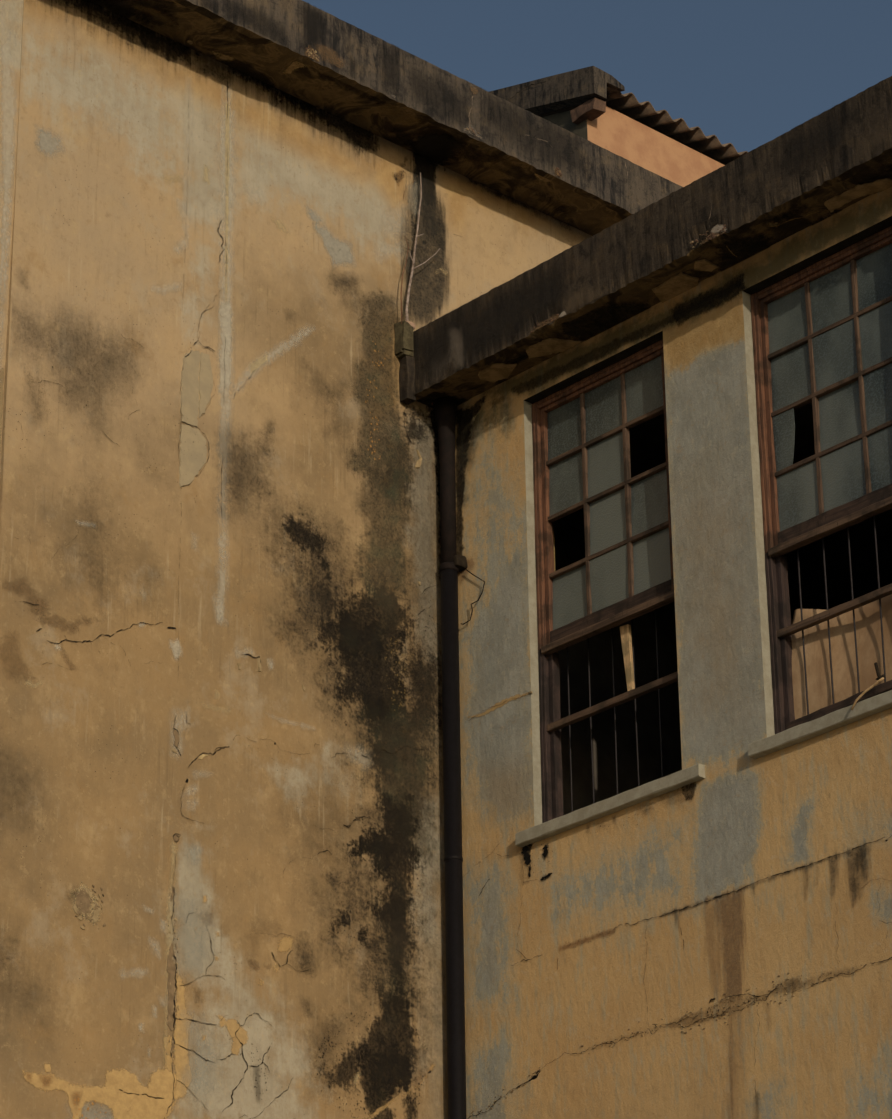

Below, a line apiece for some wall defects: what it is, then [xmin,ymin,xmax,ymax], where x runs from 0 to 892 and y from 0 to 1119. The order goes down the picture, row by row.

leakage [60,0,385,152]
leakage [396,130,498,323]
leakage [468,168,892,392]
flaking render [178,304,216,487]
crack [12,586,180,685]
leakage [281,514,441,1119]
leakage [521,844,552,880]
peeling [23,881,223,1119]
crack [202,1013,292,1119]
crack [250,933,312,985]
crack [463,835,892,1118]